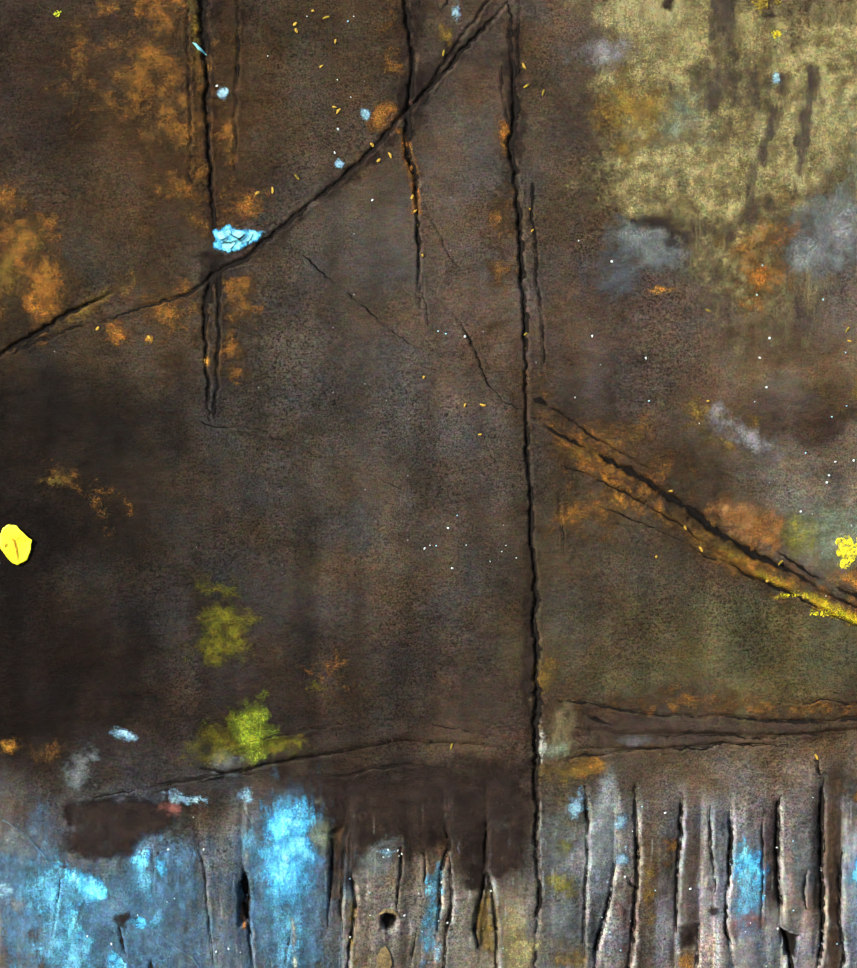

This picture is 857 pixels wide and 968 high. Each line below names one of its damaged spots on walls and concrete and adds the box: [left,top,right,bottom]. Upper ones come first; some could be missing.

corrosion [51,0,243,237]
crack [0,0,545,428]
leakage [787,187,857,270]
corrosion [107,272,263,385]
crack [463,329,857,917]
leakage [39,865,107,955]
leakage [113,912,130,927]
leakage [113,730,136,741]
leakage [169,792,206,805]
crack [583,782,640,968]
crack [709,805,734,942]
crack [761,759,846,968]